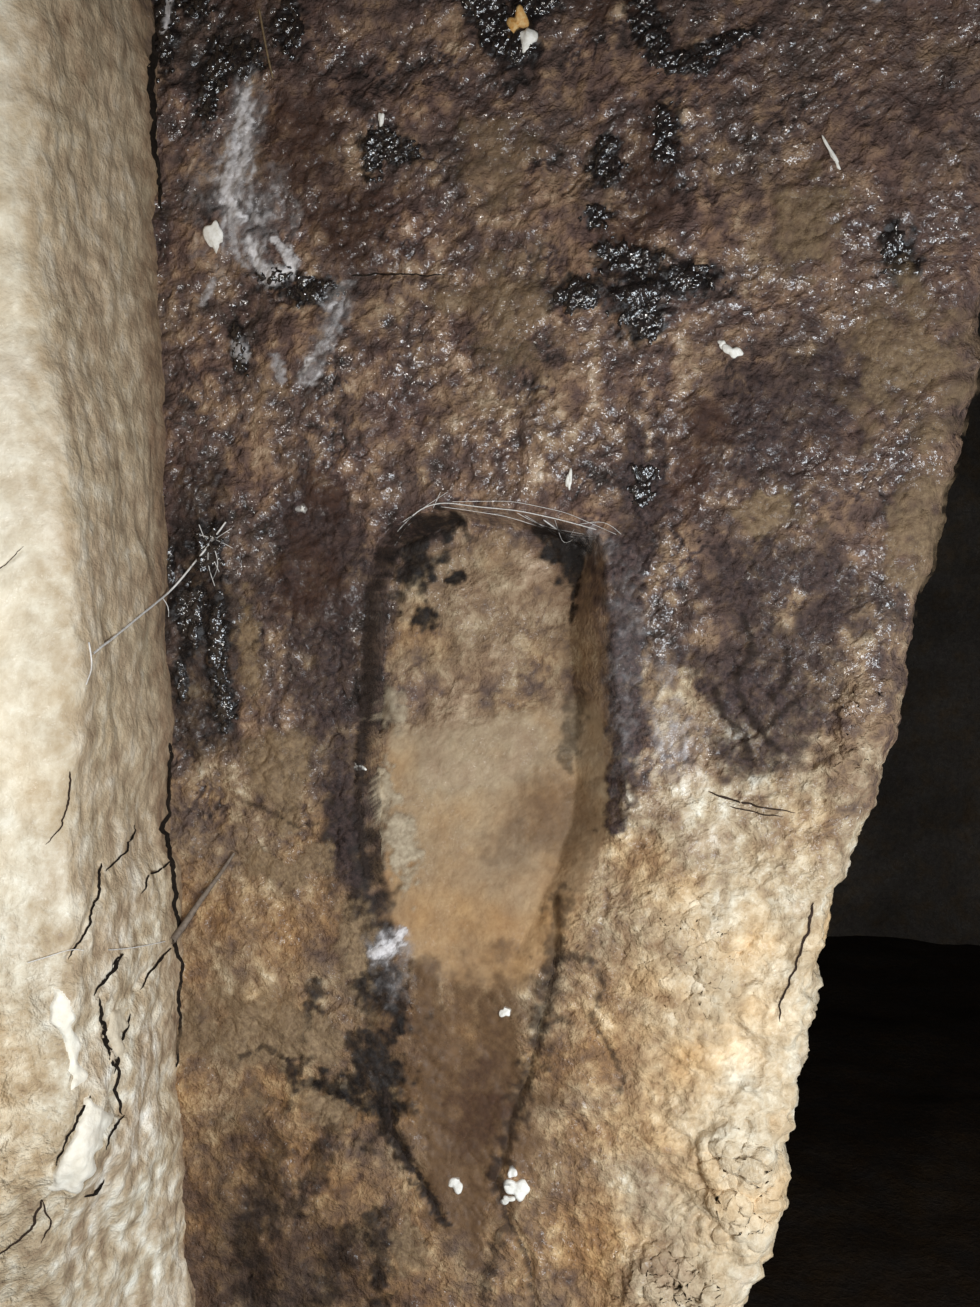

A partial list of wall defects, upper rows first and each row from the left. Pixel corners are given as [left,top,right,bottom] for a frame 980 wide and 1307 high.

damp [215,88,299,285]
damp [648,100,681,173]
damp [639,28,761,77]
damp [174,578,230,752]
damp [569,537,586,623]
damp [602,425,671,835]
damp [675,540,877,780]
crack [48,772,72,843]
damp [262,476,552,1269]
crack [56,743,185,1197]
crack [0,1200,52,1254]
damp [363,1208,391,1307]